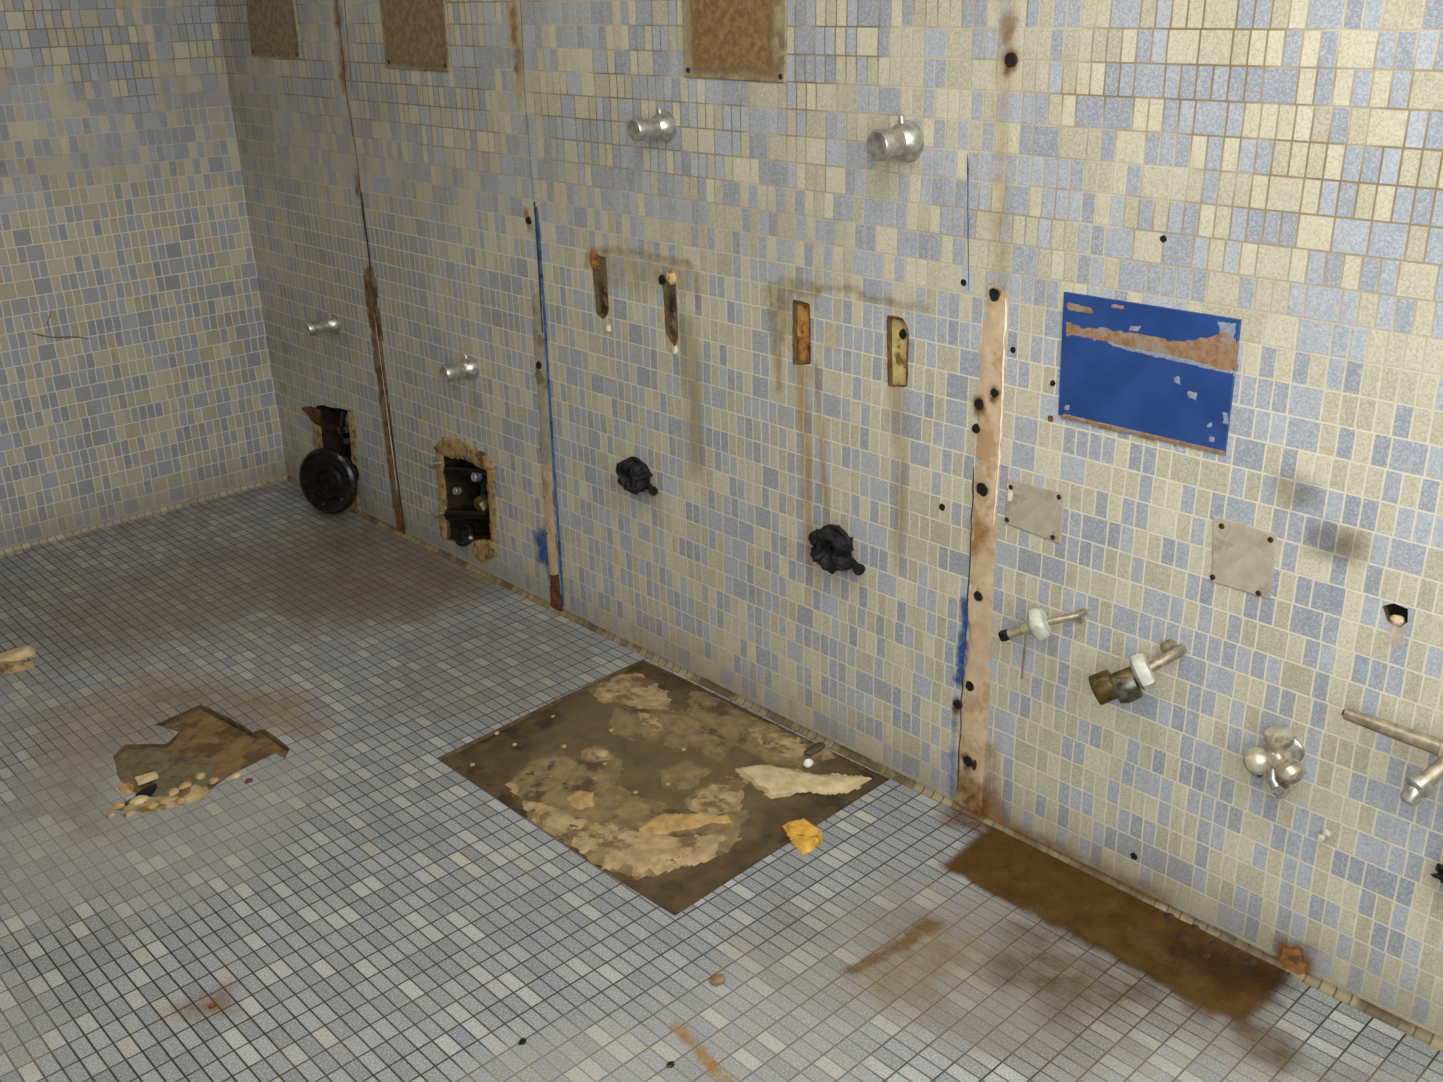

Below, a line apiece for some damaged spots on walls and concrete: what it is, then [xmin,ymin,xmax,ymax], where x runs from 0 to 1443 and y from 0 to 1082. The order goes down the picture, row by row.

peeling [1066,302,1239,400]
peeling [1206,412,1229,442]
peeling [106,705,290,817]
peeling [441,664,886,916]